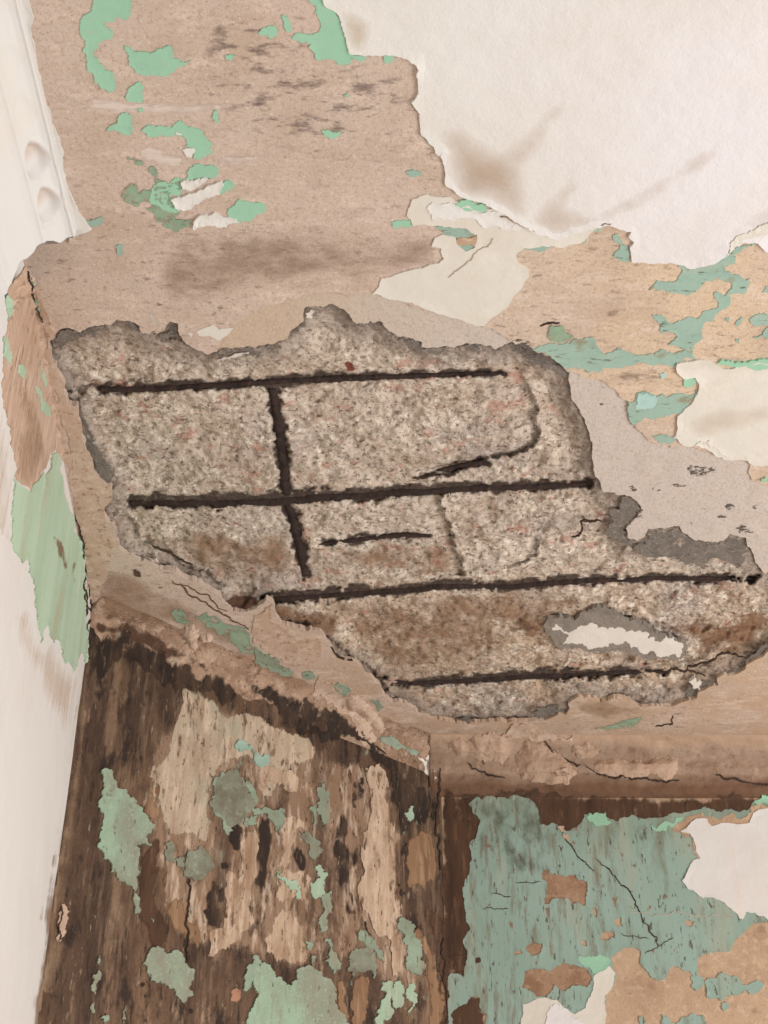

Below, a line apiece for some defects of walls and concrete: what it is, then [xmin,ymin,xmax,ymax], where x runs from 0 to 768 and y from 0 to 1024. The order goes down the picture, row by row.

spalling [1,0,768,742]
rust [412,465,487,480]
damp [91,623,235,705]
crack [152,545,249,630]
rust [226,596,258,609]
rust [681,614,768,652]
crack [544,740,679,783]
flaking render [36,777,78,1024]
damp [139,839,168,947]
damp [204,881,225,928]
peeling [96,688,768,1024]
crack [565,838,734,954]